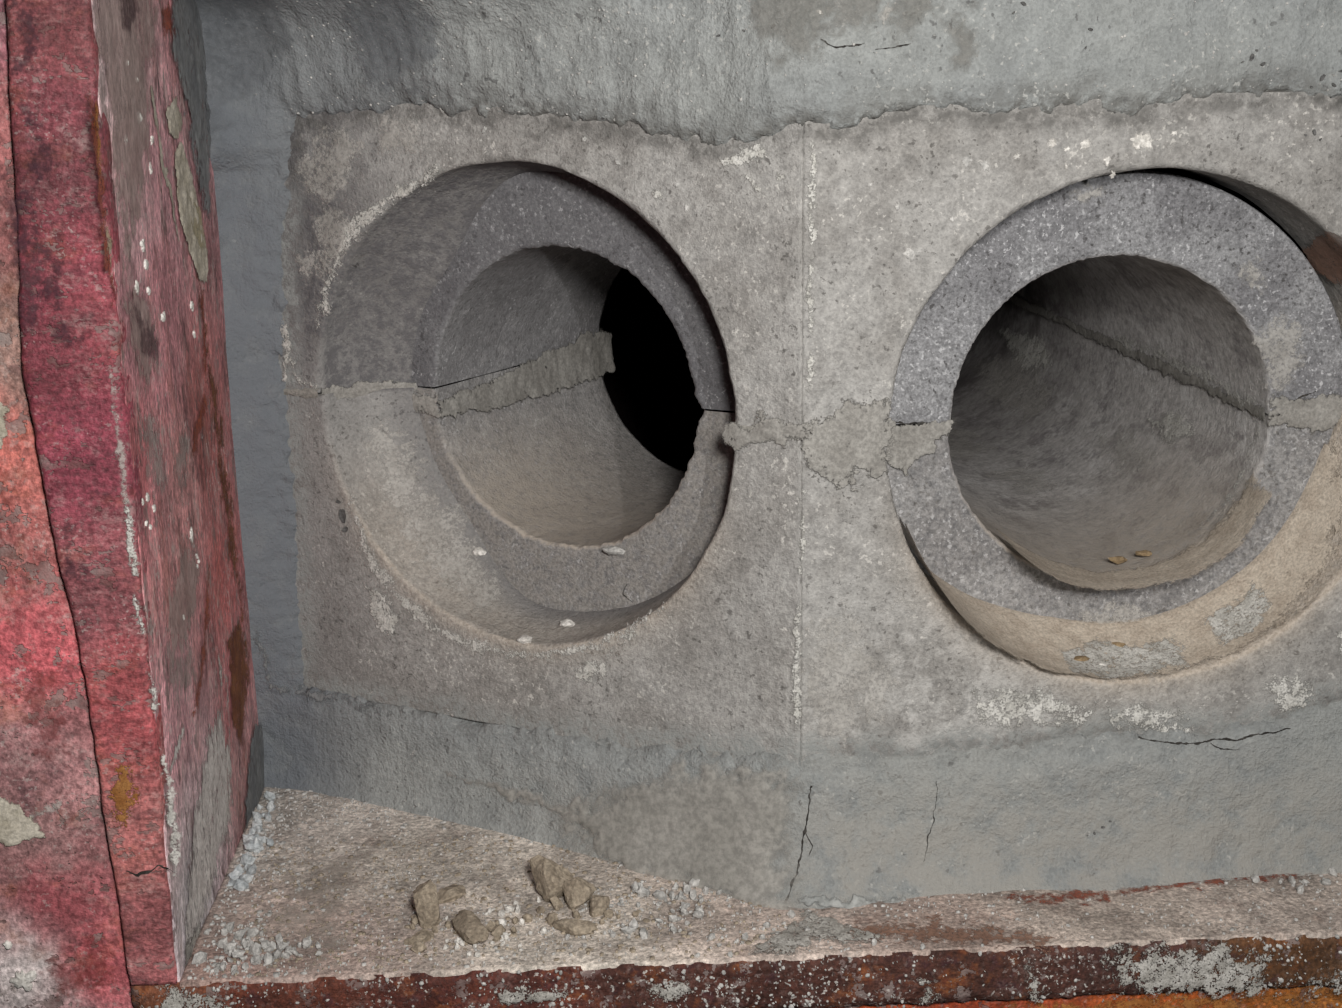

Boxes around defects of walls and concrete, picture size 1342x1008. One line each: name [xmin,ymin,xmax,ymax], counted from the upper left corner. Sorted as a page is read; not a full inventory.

crack [1138,728,1291,750]
crack [785,786,813,901]
rust [1002,987,1342,1008]